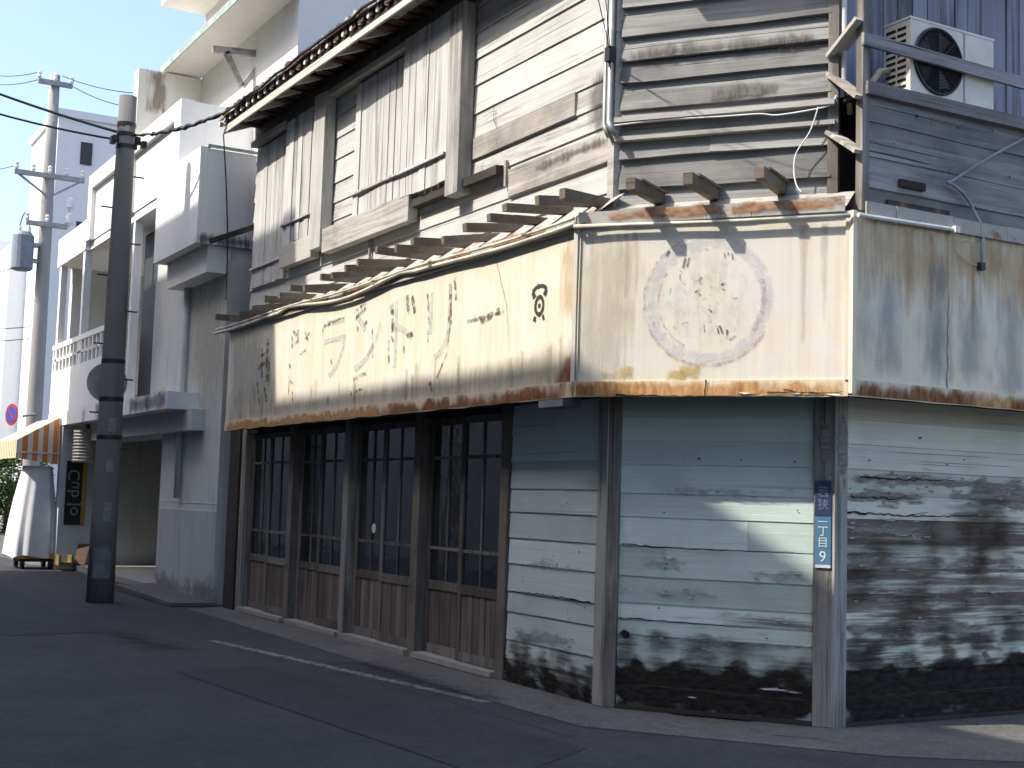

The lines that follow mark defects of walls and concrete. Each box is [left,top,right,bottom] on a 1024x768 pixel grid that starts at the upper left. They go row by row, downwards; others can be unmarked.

corrosion [609,200,833,219]
corrosion [227,357,839,430]
corrosion [858,383,1024,410]
peeling [828,415,1024,539]
damp [503,638,593,703]
damp [615,636,812,720]
damp [846,618,1024,722]